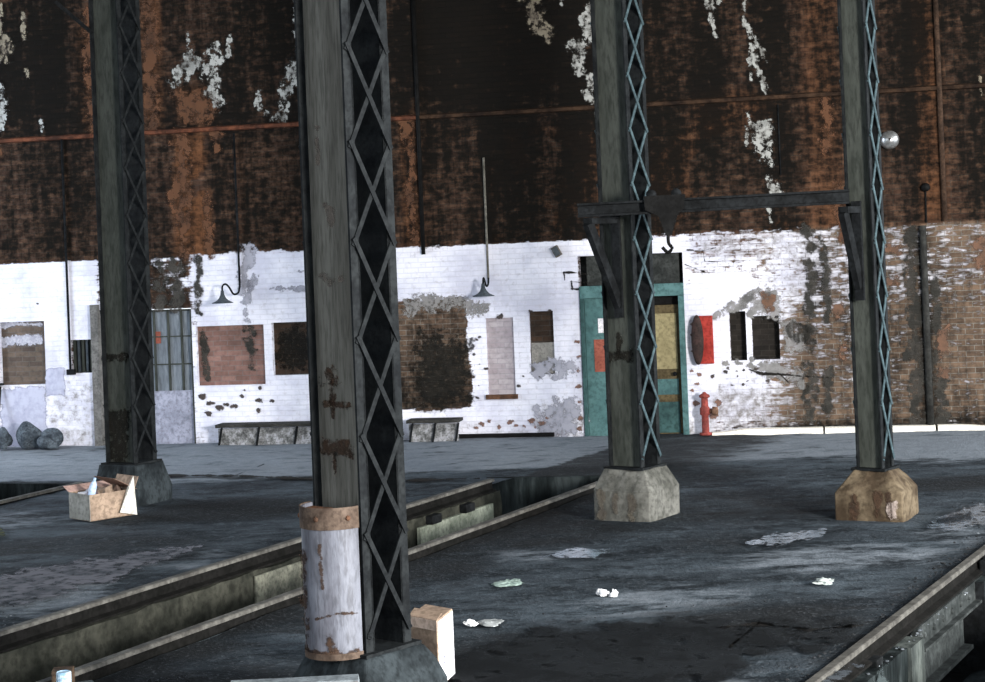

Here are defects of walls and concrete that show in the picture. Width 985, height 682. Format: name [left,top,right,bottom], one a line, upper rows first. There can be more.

rust [140,0,224,261]
spalling [885,244,902,256]
spalling [971,236,985,274]
leakage [786,222,835,423]
rust [299,544,360,655]
spalling [822,557,985,682]